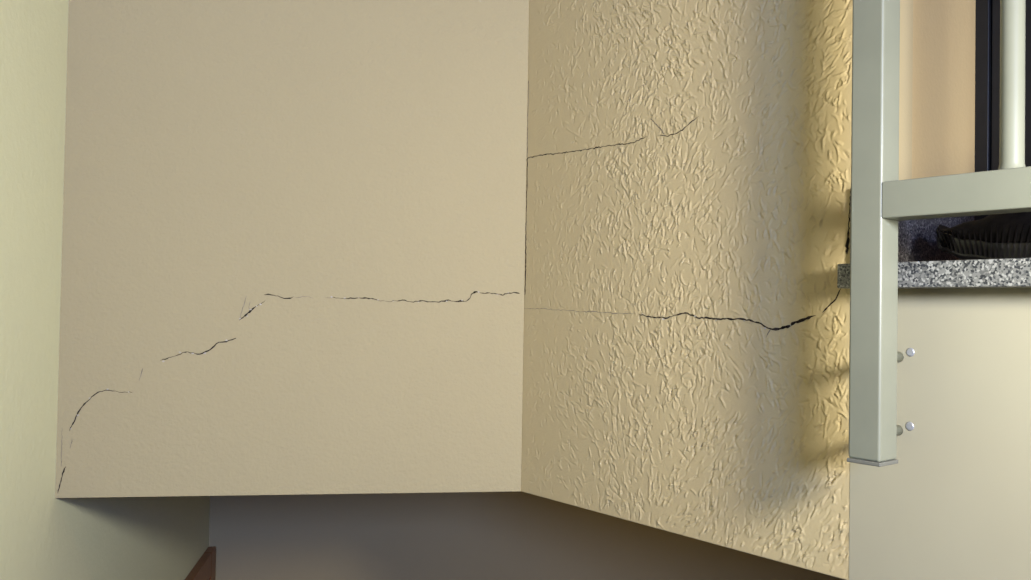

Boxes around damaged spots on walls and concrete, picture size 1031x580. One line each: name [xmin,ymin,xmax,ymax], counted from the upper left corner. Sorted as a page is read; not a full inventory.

crack [58,81,841,491]